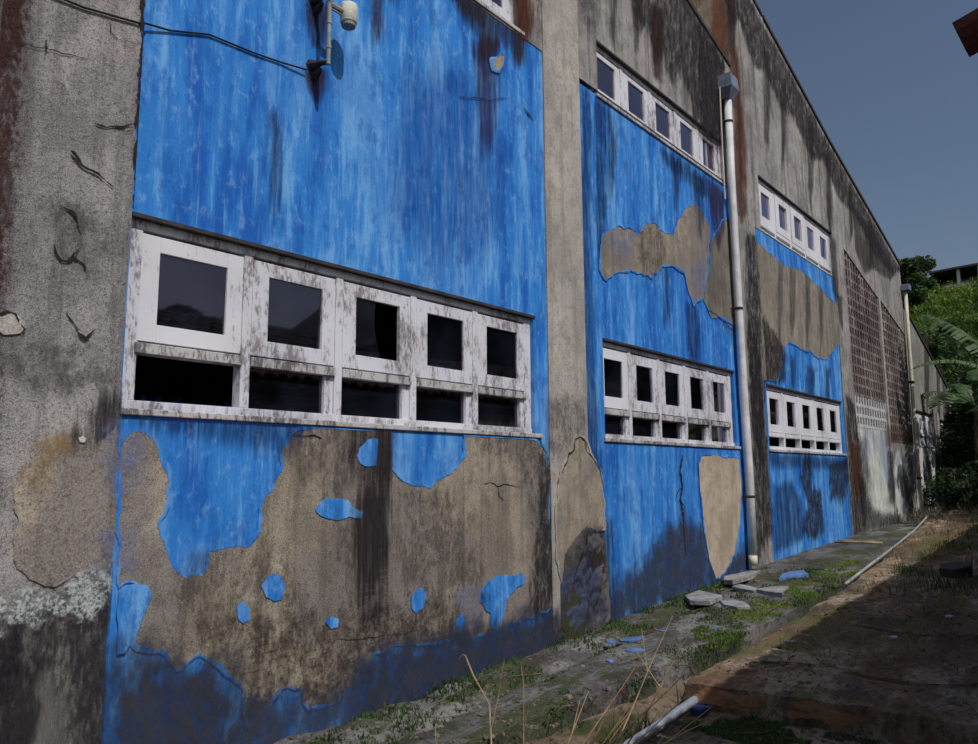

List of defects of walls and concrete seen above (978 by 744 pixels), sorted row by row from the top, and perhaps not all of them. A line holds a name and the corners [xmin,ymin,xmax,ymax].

rust [0,0,31,307]
crack [54,205,86,271]
crack [71,0,145,210]
leakage [0,89,618,744]
peeling [13,425,606,711]
rust [516,0,534,38]
peeling [599,201,740,330]
crack [676,457,687,557]
peeling [698,453,742,580]
rust [712,0,747,221]
leakage [632,0,900,326]
peeling [752,241,840,382]